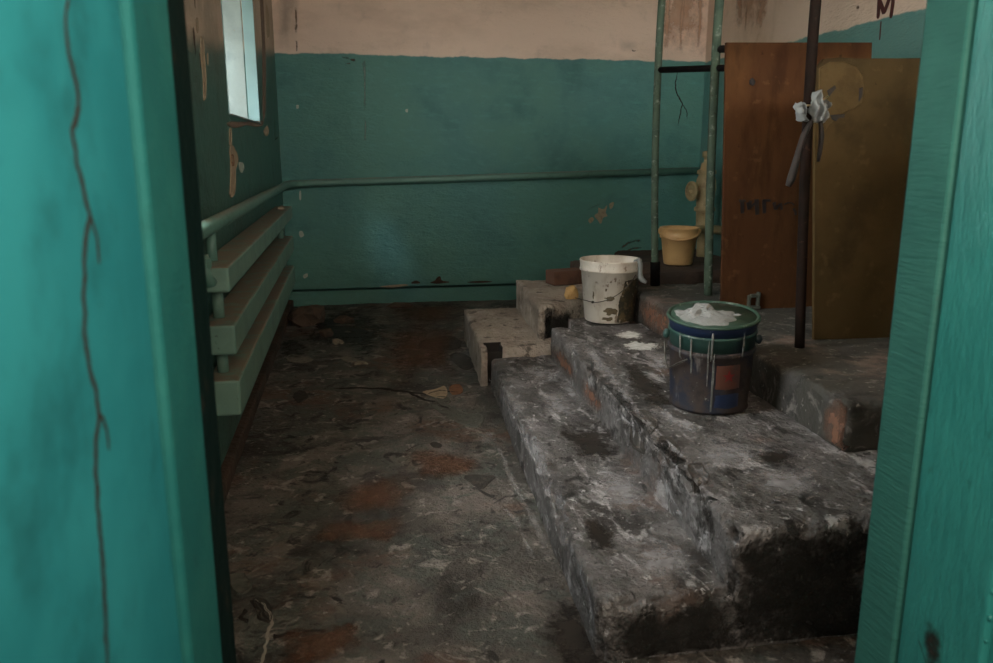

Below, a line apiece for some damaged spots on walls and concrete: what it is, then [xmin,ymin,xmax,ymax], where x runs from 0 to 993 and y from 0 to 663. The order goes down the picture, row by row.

peeling [226,0,270,198]
crack [64,0,110,663]
damp [543,584,605,663]
damp [617,525,868,658]